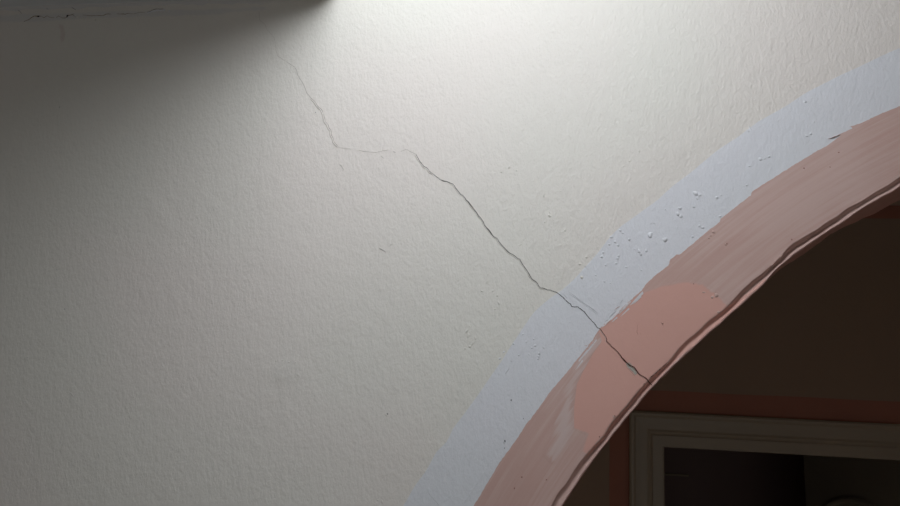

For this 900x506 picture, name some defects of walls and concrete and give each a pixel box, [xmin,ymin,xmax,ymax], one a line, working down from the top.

crack [259,16,661,385]